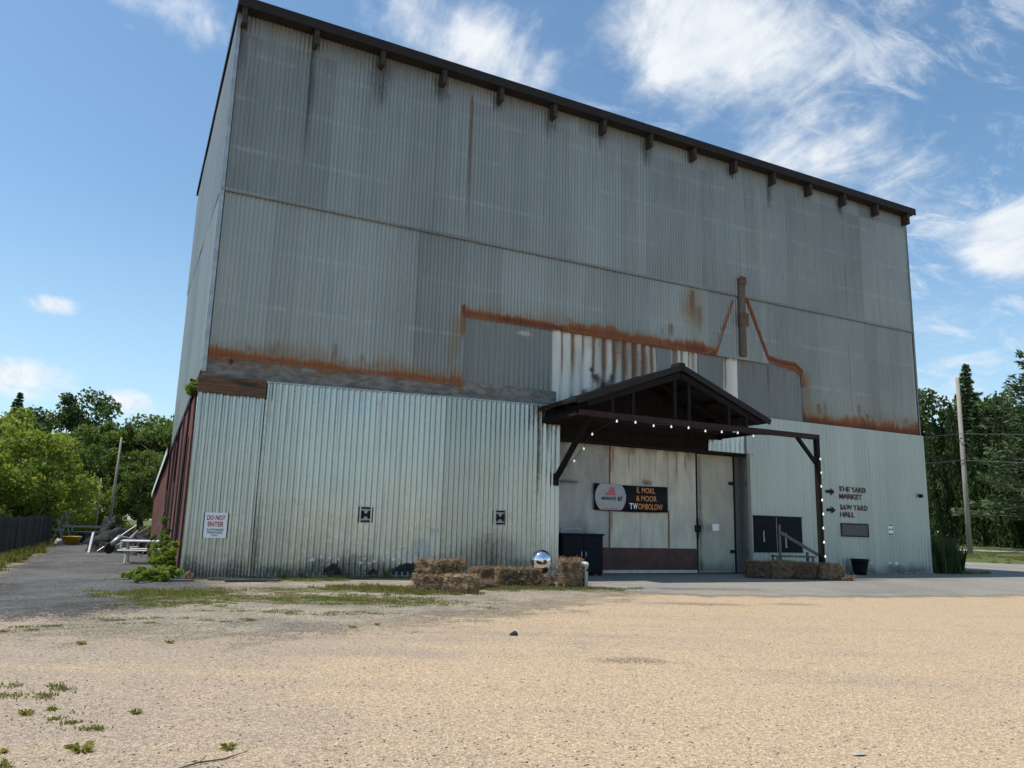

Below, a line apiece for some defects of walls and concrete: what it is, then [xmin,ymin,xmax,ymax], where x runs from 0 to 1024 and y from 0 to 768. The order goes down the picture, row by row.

rust [207,298,919,436]